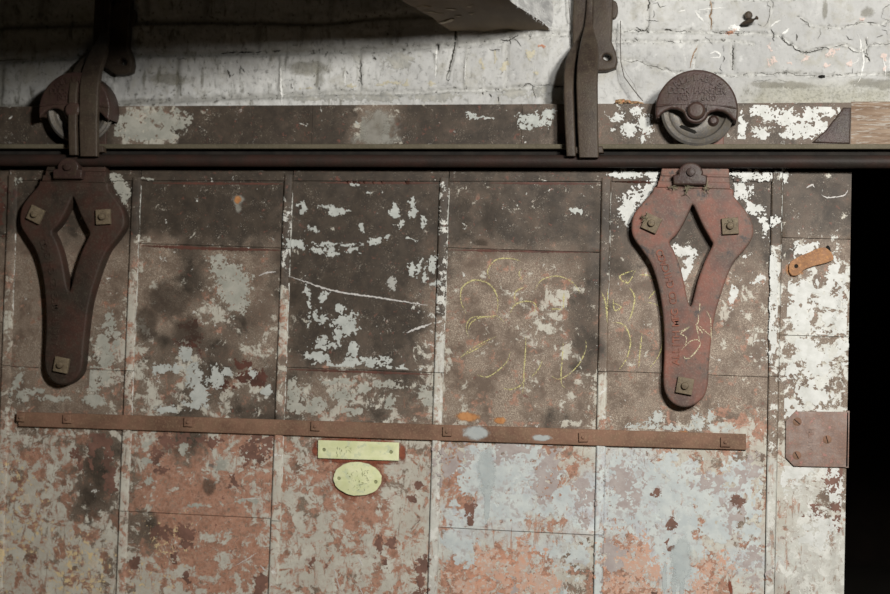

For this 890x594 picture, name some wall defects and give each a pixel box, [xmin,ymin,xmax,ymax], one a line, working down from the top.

crack [625,0,890,82]
peeling [609,106,655,144]
peeling [738,105,841,140]
peeling [282,196,427,257]
peeling [606,169,661,229]
peeling [407,251,442,286]
peeling [671,242,698,281]
peeling [287,284,423,417]
peeling [137,431,278,505]
peeling [780,466,843,551]
peeling [148,522,199,585]
peeling [252,573,268,594]